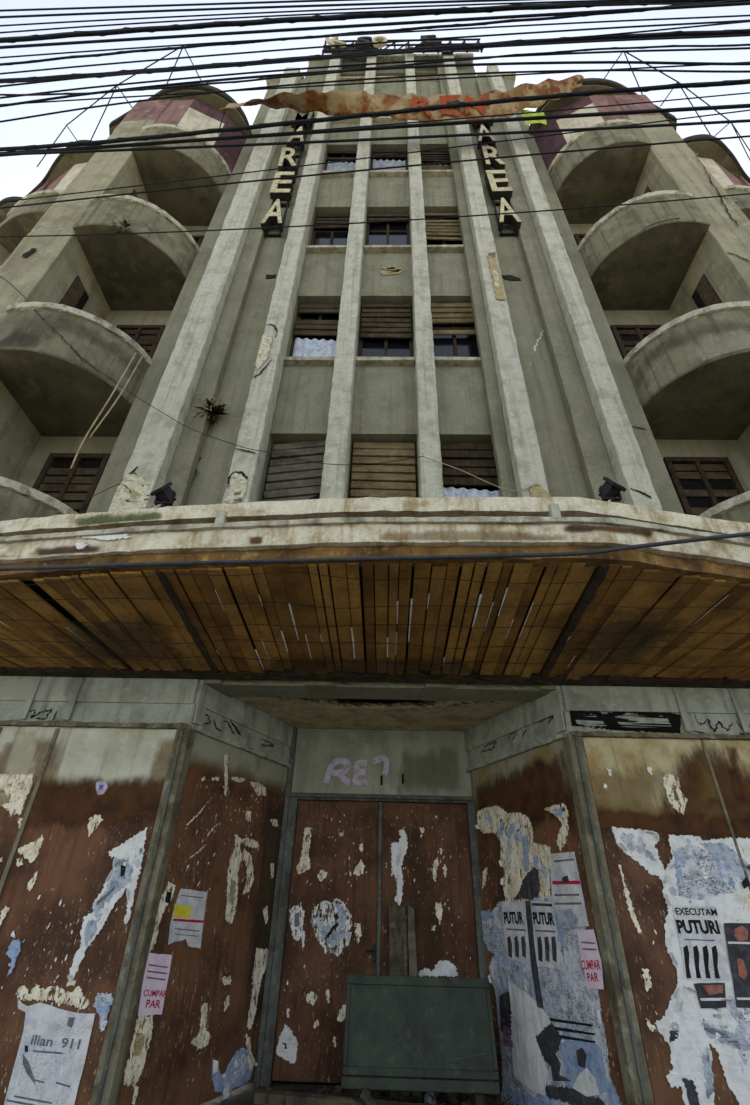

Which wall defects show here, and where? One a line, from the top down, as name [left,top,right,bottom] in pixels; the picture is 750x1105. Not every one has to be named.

flaking render [255,332,272,369]
flaking render [108,473,154,512]
flaking render [224,471,248,504]
rust [565,524,652,536]
rust [35,545,98,555]
peeling [0,773,33,828]